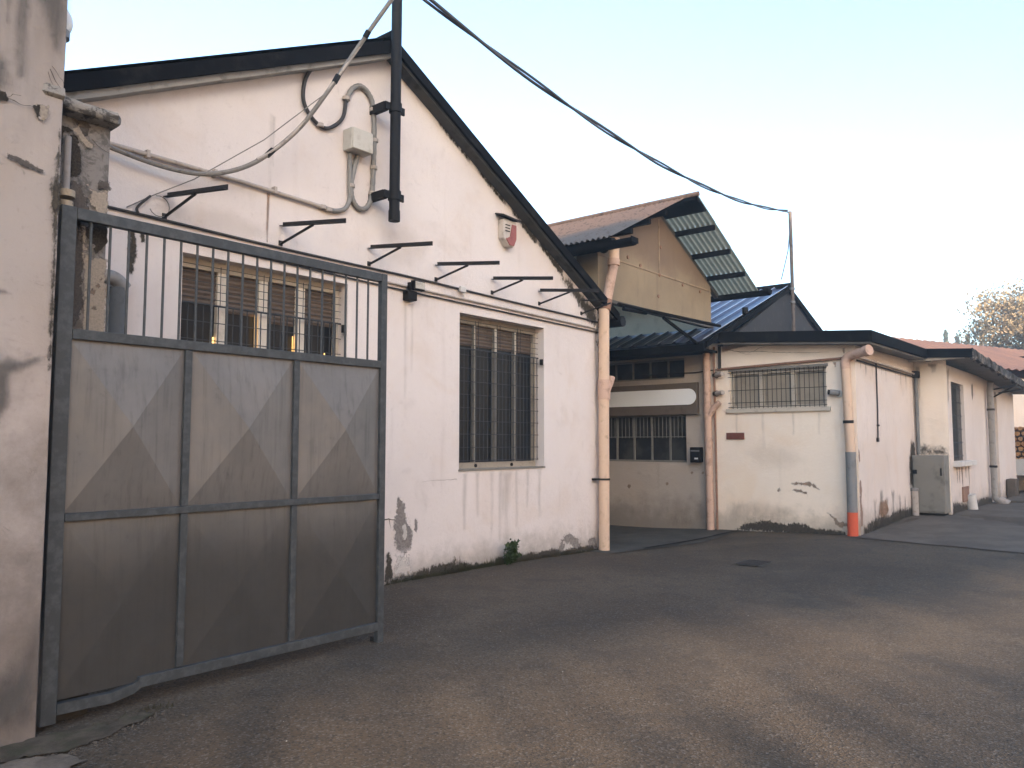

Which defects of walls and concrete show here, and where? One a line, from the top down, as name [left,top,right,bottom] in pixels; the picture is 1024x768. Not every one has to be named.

peeling [61,120,109,332]
peeling [392,496,417,557]
spalling [559,532,597,553]
leakage [737,520,846,535]
leakage [864,507,912,534]
leakage [385,545,593,585]